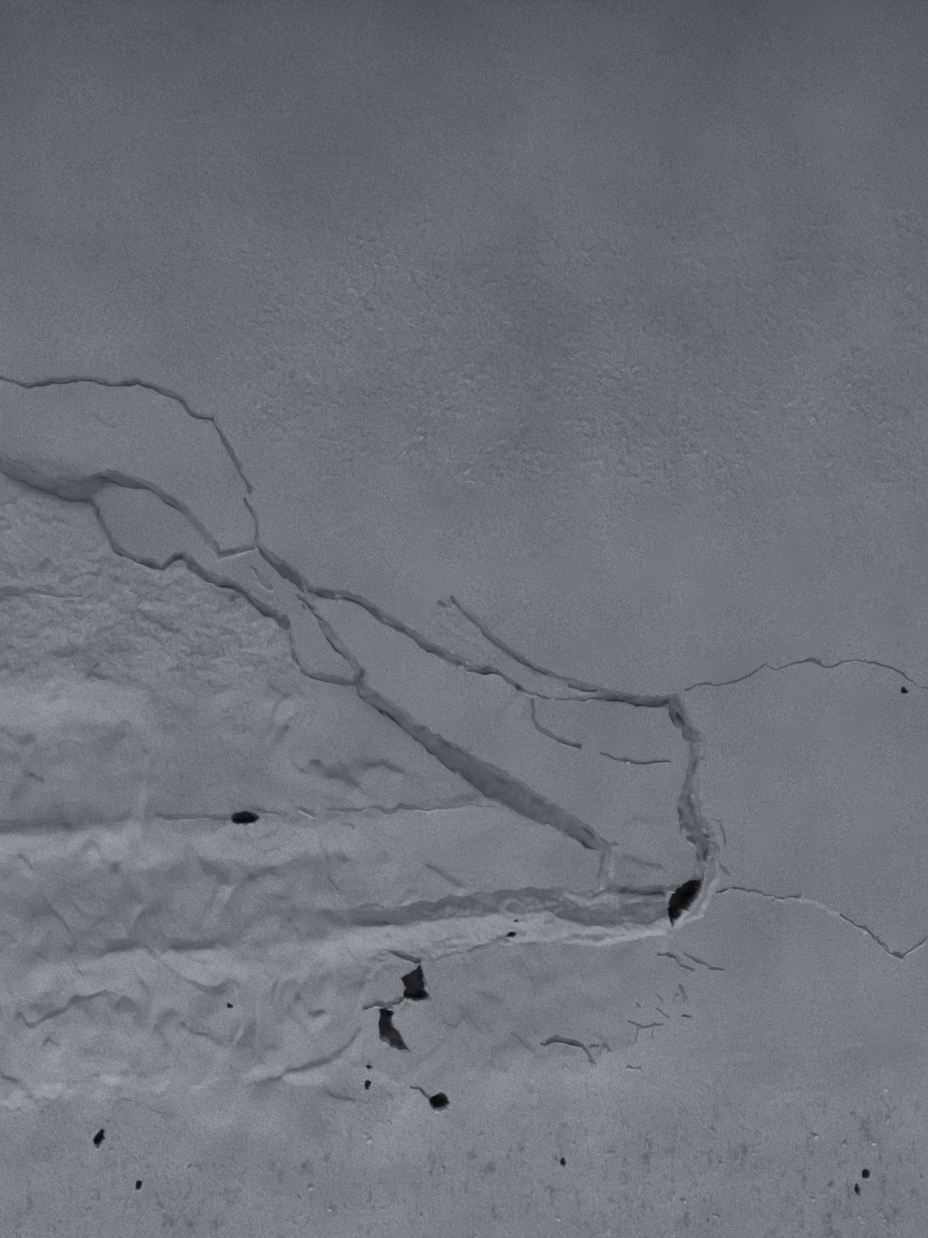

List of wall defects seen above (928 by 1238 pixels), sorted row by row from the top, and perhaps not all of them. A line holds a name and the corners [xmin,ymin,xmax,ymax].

flaking render [0,451,671,1112]
crack [0,378,928,1071]